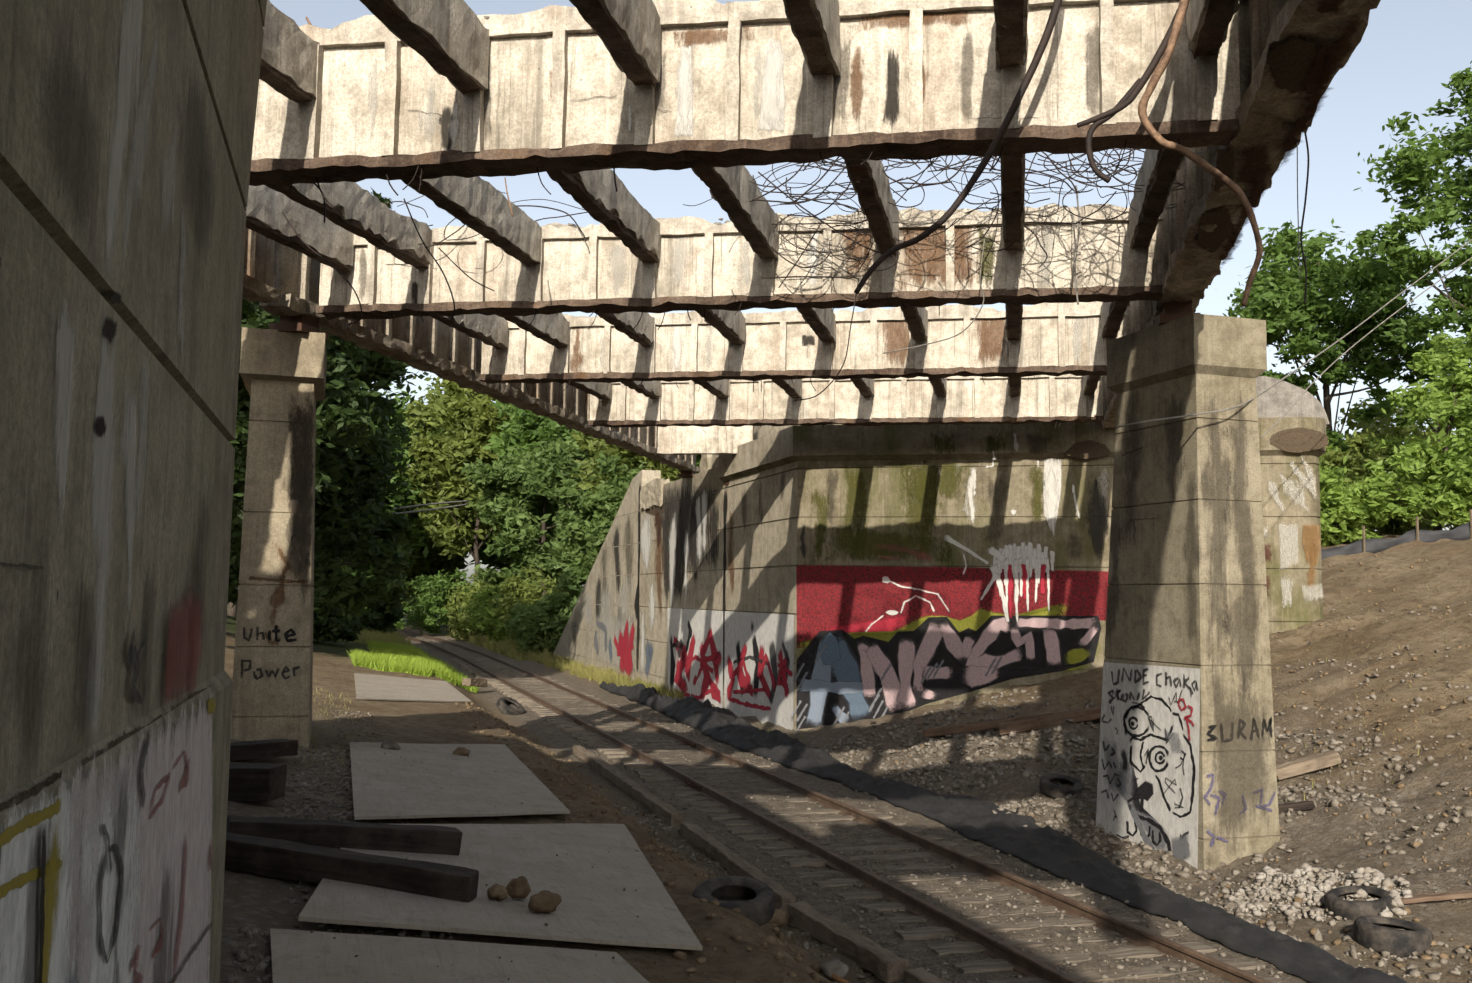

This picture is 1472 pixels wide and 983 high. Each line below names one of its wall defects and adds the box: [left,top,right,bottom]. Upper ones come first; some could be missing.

water stain [883,51,899,127]
spalling [1266,35,1317,94]
water stain [439,102,463,150]
spalling [1214,142,1272,191]
spalling [1196,207,1236,255]
water stain [289,397,315,569]
water stain [800,434,1019,563]